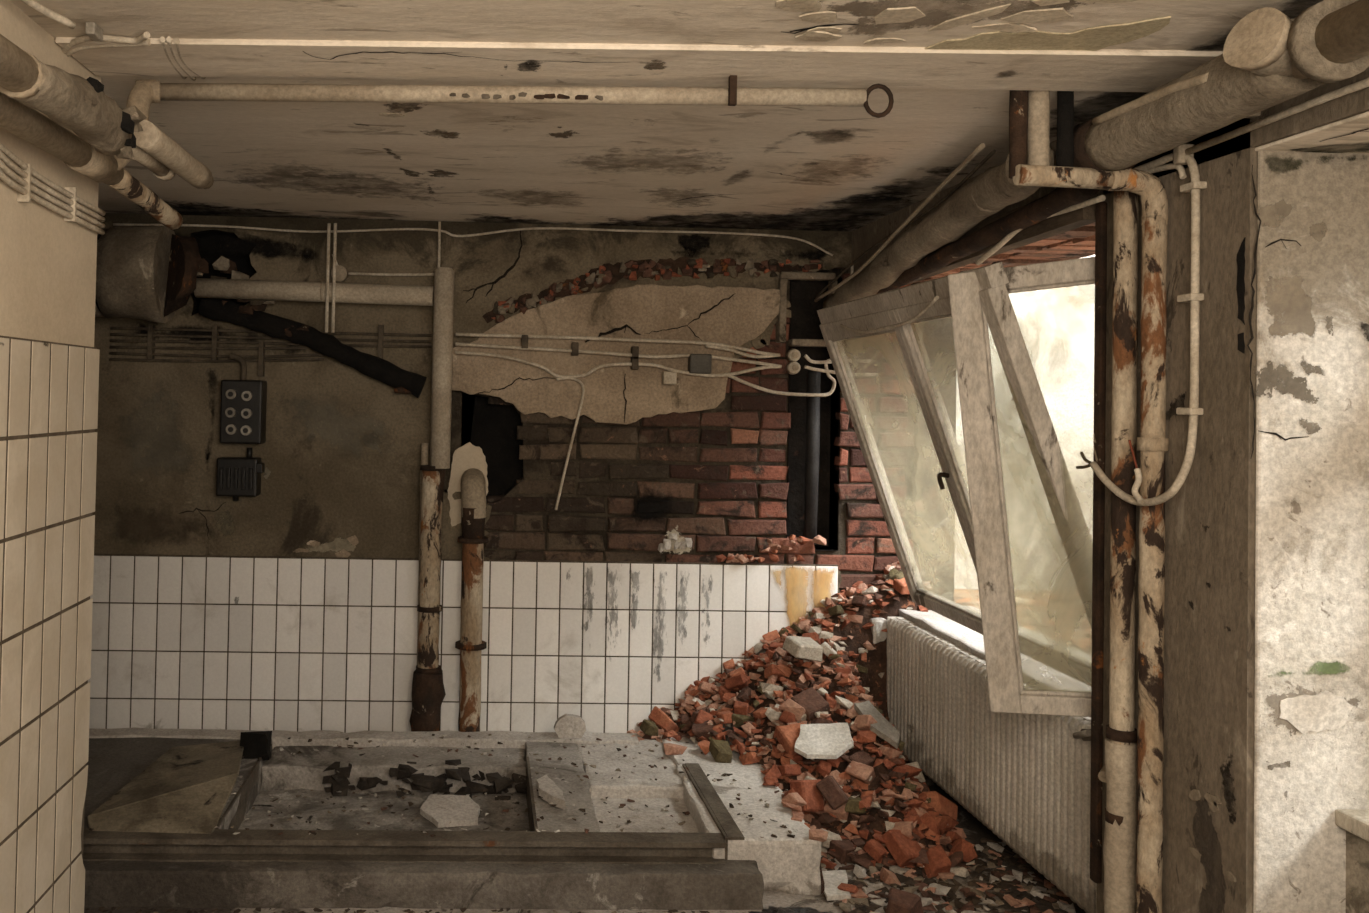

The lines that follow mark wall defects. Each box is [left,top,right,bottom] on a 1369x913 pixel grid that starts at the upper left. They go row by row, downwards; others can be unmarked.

peeling [775,0,1171,51]
water stain [797,130,853,141]
water stain [241,169,423,199]
spalling [191,230,257,315]
crack [463,230,522,303]
spalling [1236,237,1246,354]
peeling [1255,361,1324,434]
water stain [583,569,638,639]
water stain [653,573,712,679]
flaking render [444,257,977,878]
peeling [1188,756,1237,913]
spalling [885,888,924,913]